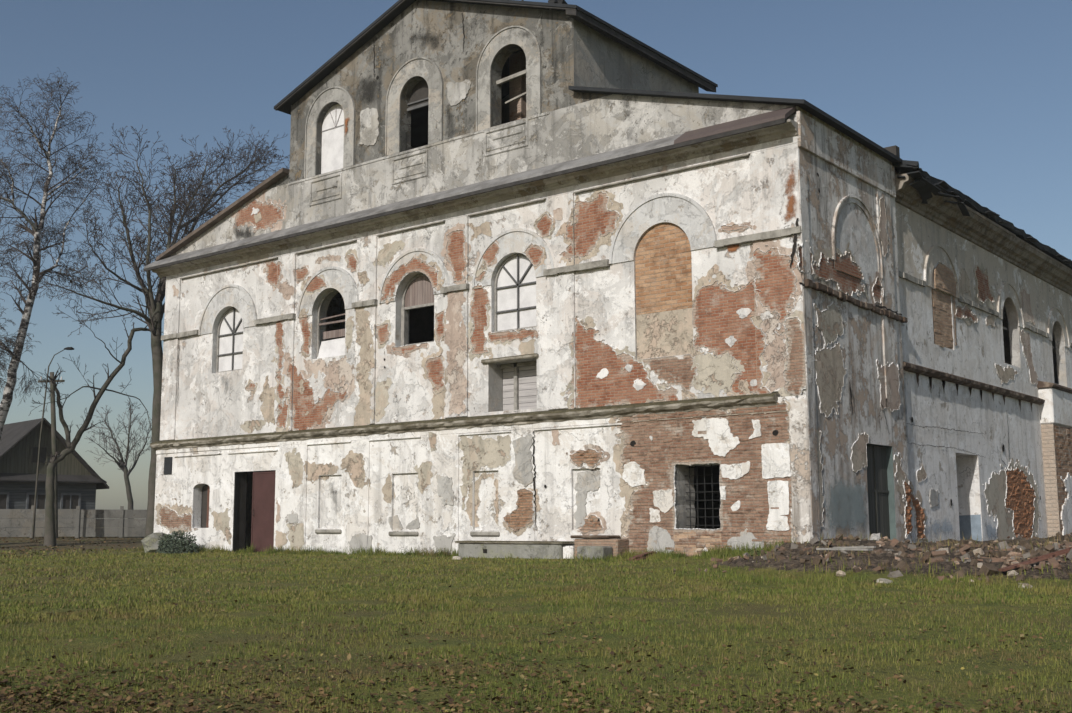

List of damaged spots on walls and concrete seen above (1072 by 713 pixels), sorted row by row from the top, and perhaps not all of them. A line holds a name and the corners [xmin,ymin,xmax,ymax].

flaking render [230,189,287,233]
flaking render [523,188,624,270]
flaking render [237,221,540,494]
flaking render [551,222,884,557]
flaking render [155,498,198,535]
flaking render [211,508,232,545]
flaking render [284,447,396,504]
flaking render [456,433,546,536]
spalling [894,452,928,542]
flaking render [983,444,1041,540]